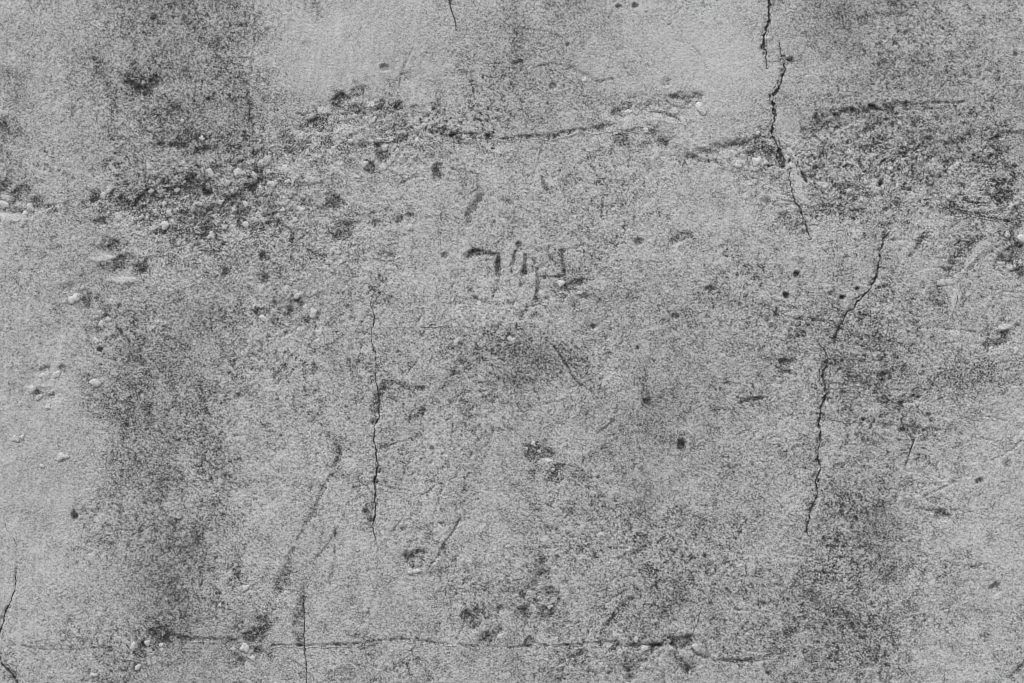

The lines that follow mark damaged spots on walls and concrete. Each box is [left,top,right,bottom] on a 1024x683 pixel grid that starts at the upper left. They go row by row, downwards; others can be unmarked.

crack [760,0,812,239]
crack [342,279,478,573]
crack [786,229,892,627]